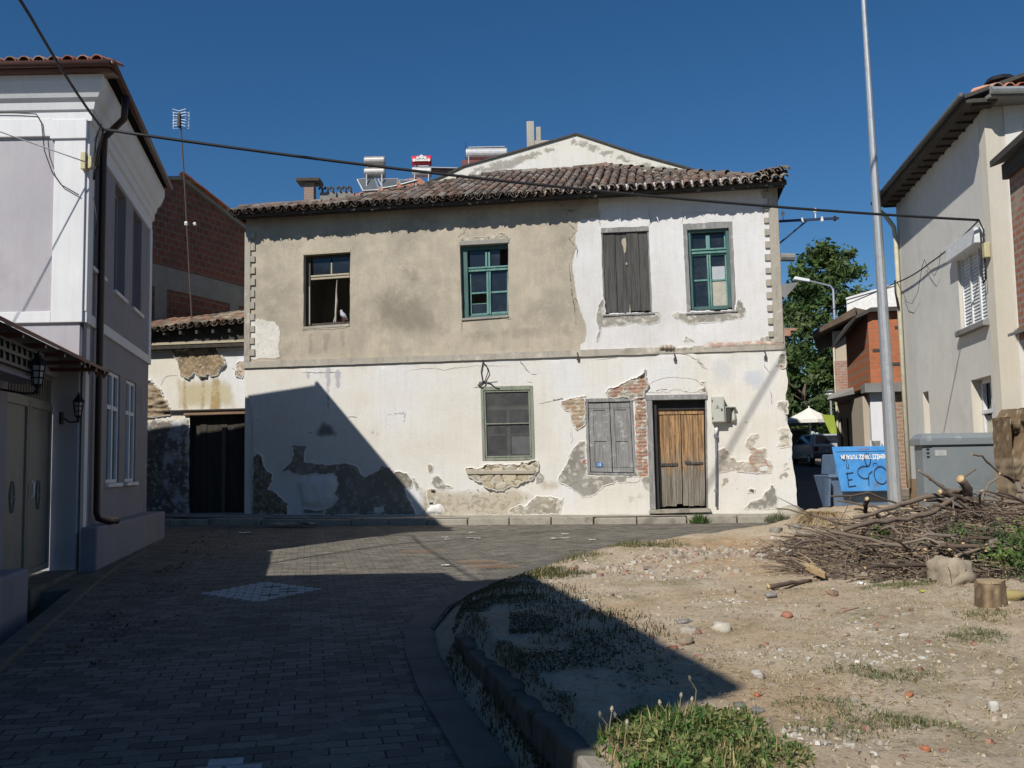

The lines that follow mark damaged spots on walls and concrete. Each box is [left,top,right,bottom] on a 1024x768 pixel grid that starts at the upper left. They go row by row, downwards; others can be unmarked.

water stain [183,380,230,409]
flaking render [170,343,244,380]
flaking render [251,444,564,516]
flaking render [560,395,586,431]
flaking render [605,368,649,484]
flaking render [717,400,791,488]